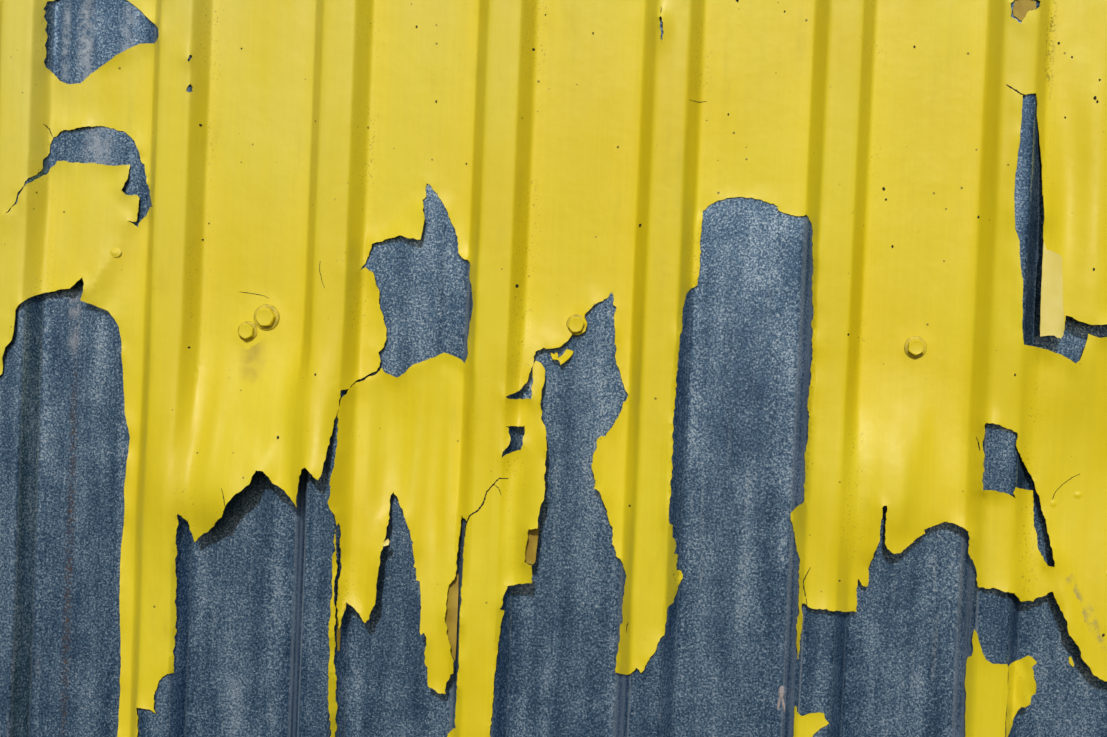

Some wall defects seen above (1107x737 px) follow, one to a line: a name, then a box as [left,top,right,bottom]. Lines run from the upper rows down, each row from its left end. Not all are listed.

peeling [0,126,154,737]
peeling [46,0,158,84]
peeling [138,184,473,737]
crack [464,478,508,537]
peeling [490,197,1107,737]
peeling [1014,94,1107,361]